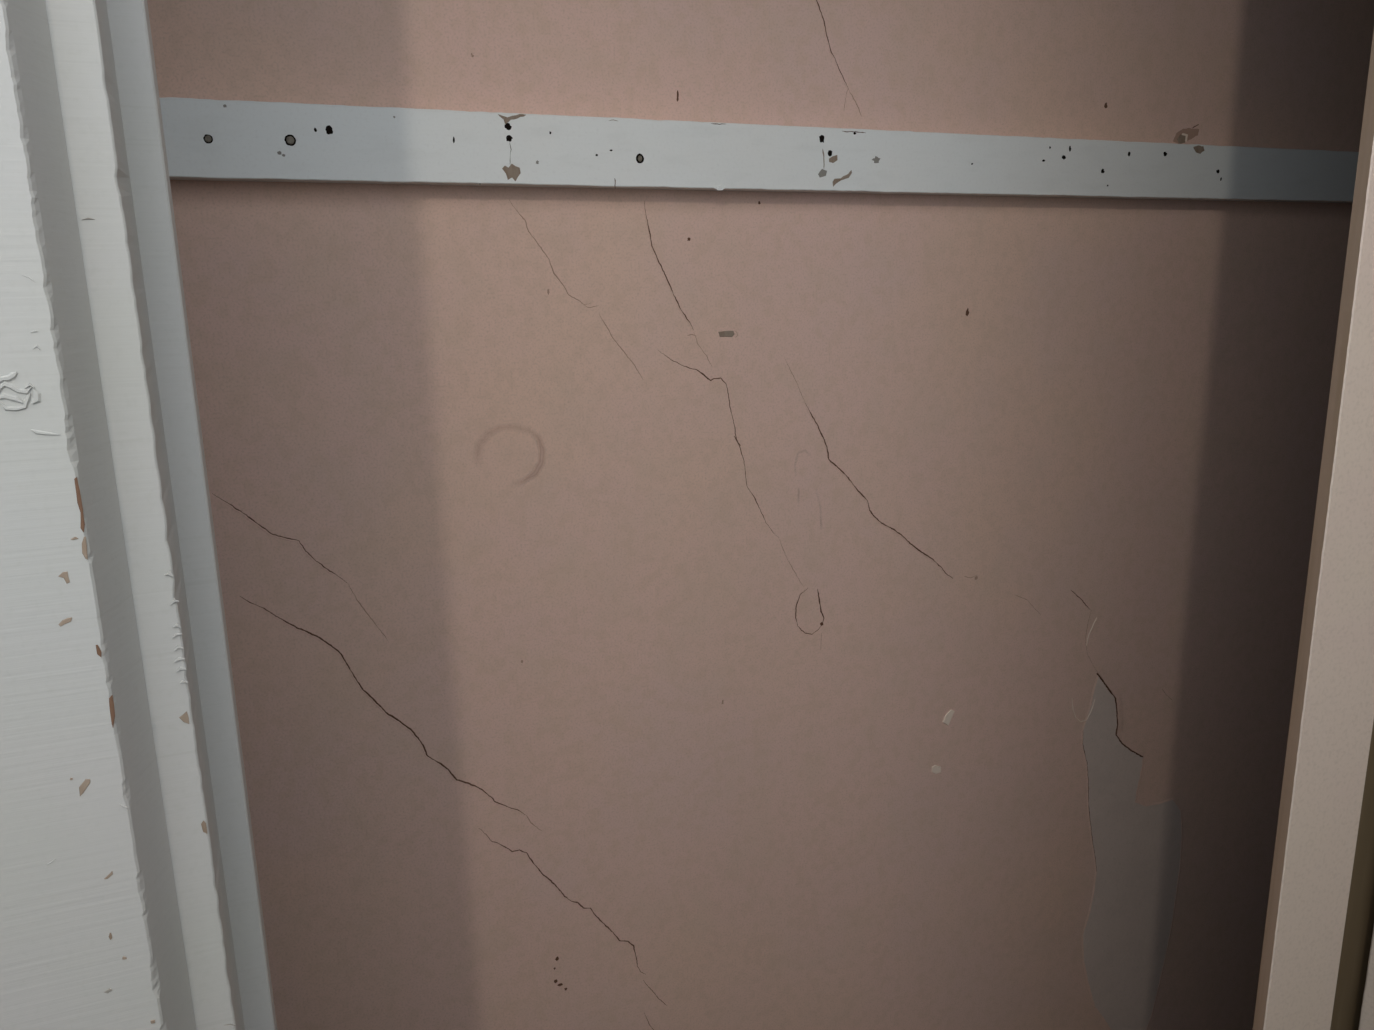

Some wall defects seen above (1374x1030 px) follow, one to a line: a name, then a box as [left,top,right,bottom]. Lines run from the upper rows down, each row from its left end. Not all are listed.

crack [212,495,387,639]
crack [510,201,824,640]
crack [787,364,977,579]
crack [240,596,667,1030]
peeling [1072,667,1183,1030]